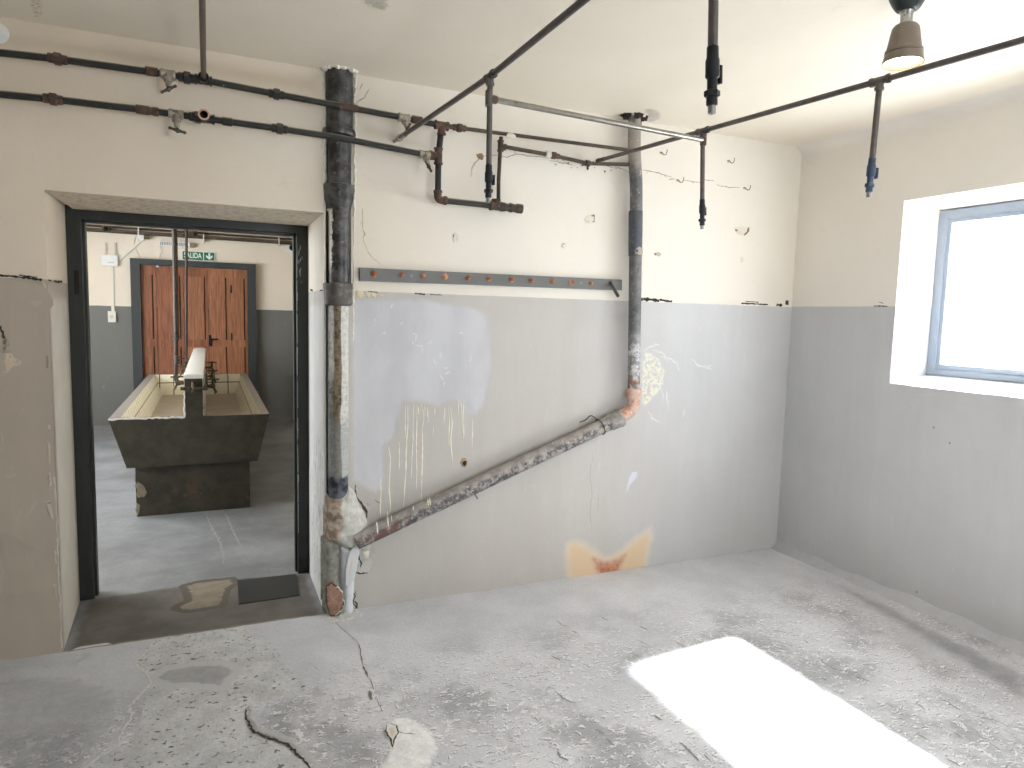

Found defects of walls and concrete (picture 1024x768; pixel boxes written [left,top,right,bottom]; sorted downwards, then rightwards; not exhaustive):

flaking render [355,540,380,578]
flaking render [325,581,345,617]
crack [335,591,413,747]